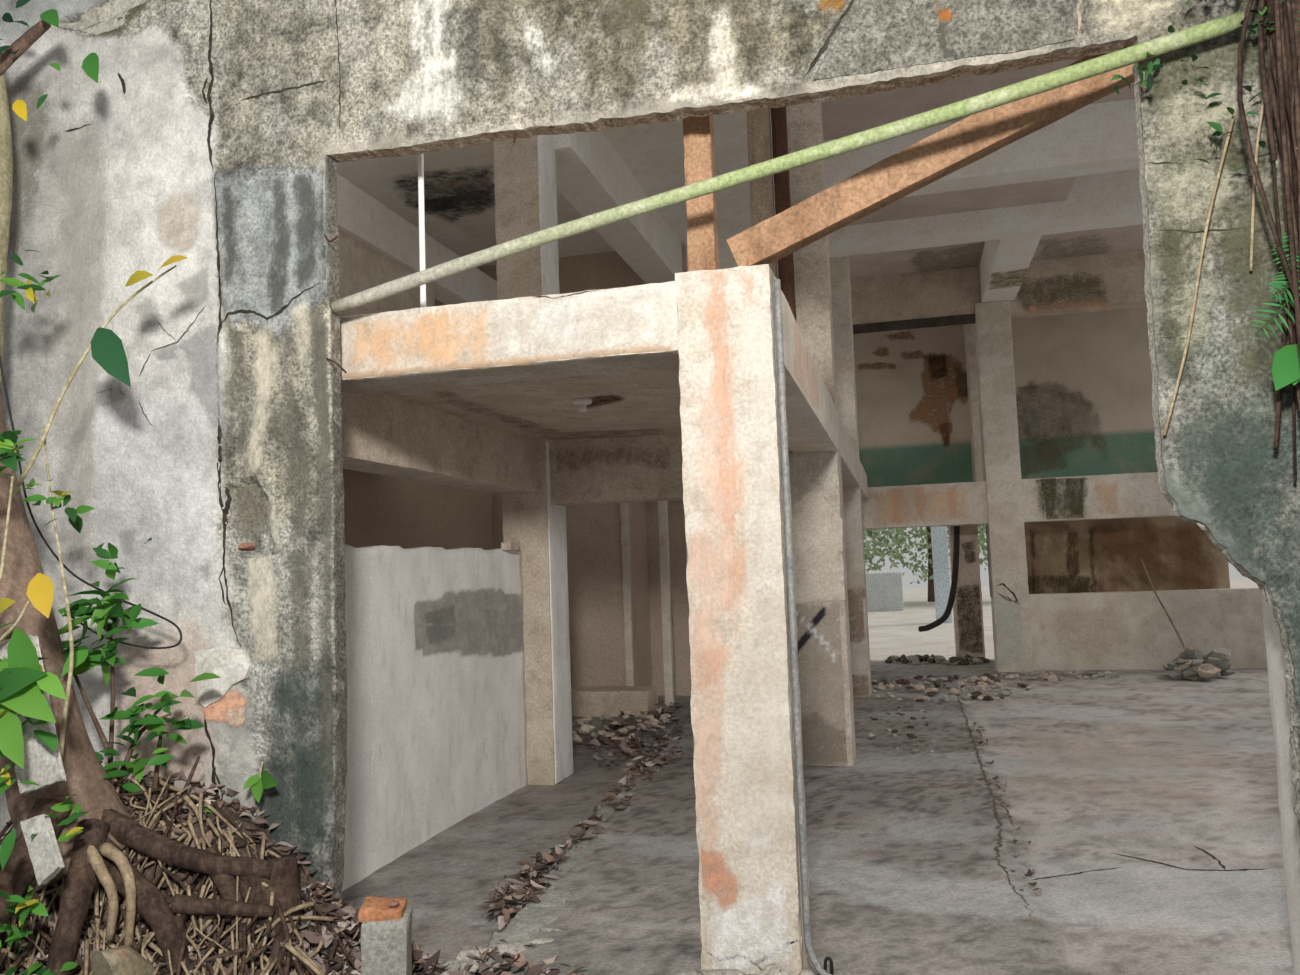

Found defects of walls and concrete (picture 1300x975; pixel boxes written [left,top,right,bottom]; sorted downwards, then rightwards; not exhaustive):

spalling [59,0,150,35]
water stain [383,0,461,120]
water stain [671,8,760,105]
crack [805,0,854,75]
water stain [397,169,495,220]
crack [97,0,341,647]
spalling [858,332,968,446]
water stain [157,176,333,881]
water stain [1016,383,1103,594]
peeling [195,646,253,726]
crack [956,695,1269,920]
corrosion [701,850,736,908]